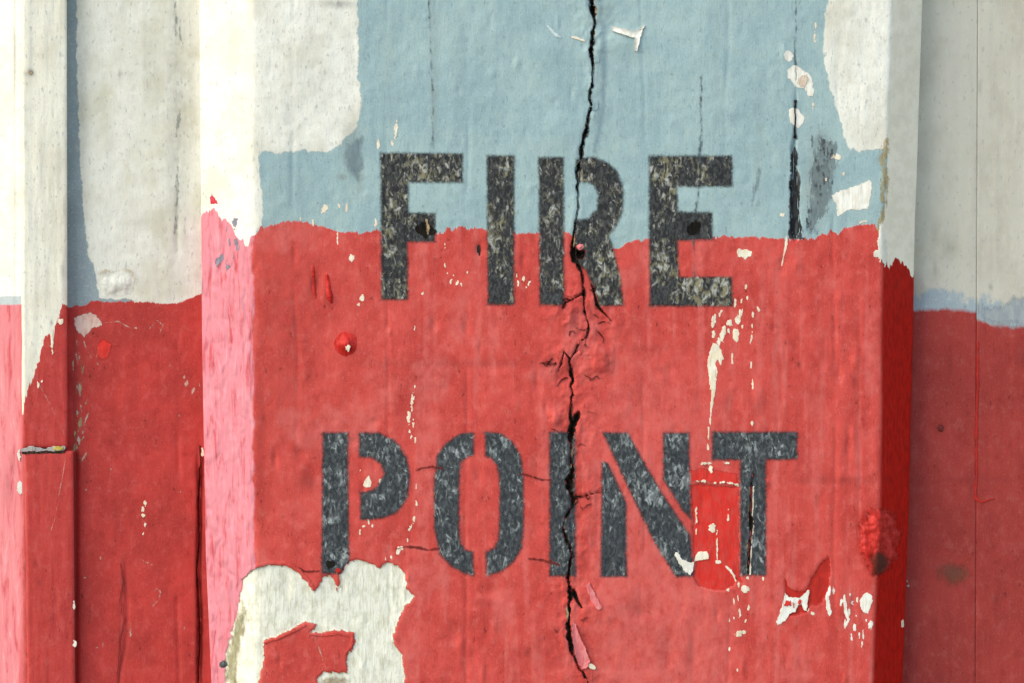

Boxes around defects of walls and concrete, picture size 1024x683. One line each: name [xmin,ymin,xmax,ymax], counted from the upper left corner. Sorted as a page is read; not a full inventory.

peeling [612,26,645,51]
peeling [407,385,416,443]
crack [521,0,609,683]
peeling [675,284,760,651]
peeling [225,484,418,683]
peeling [776,558,873,647]